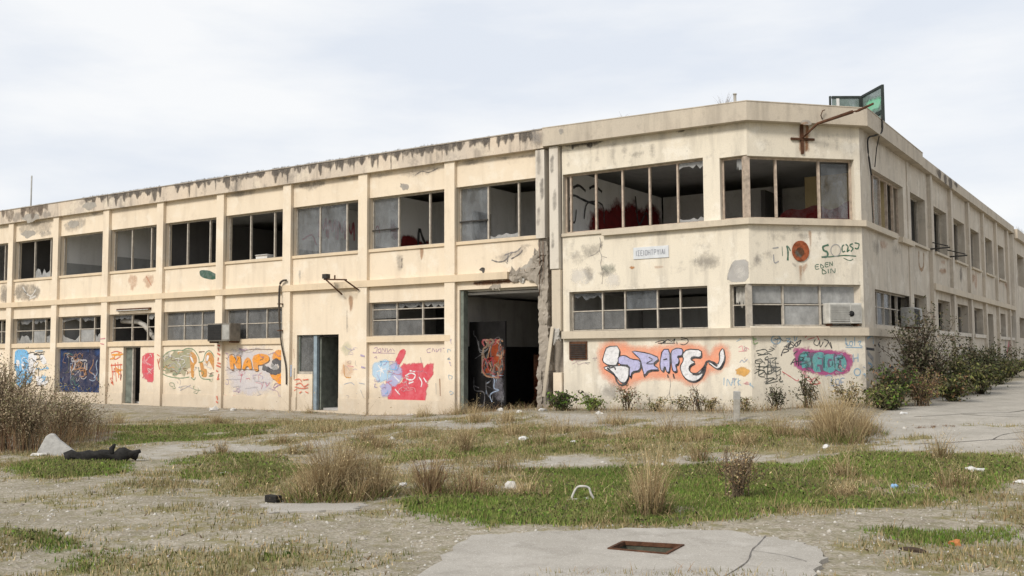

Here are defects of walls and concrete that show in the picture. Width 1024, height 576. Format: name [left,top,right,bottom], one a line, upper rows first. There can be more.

leakage [175,131,535,194]
leakage [83,187,161,204]
leakage [2,204,48,217]
peeling [728,260,749,282]
spalling [474,237,555,408]